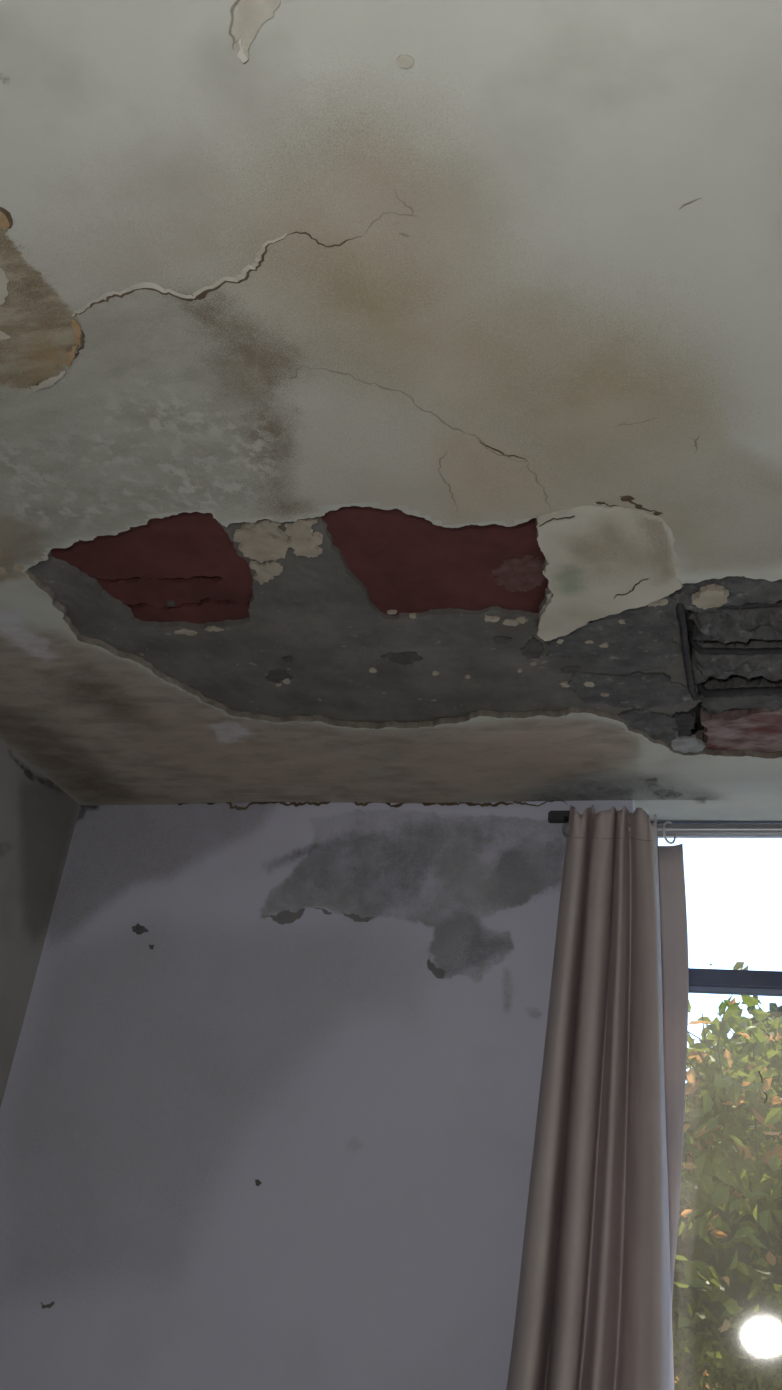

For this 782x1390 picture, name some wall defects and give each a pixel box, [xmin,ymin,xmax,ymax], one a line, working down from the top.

peeling [229,0,280,63]
peeling [0,191,87,392]
crack [72,189,420,317]
damp [157,48,782,578]
crack [289,365,551,511]
spalling [24,506,782,759]
damp [0,623,650,1019]